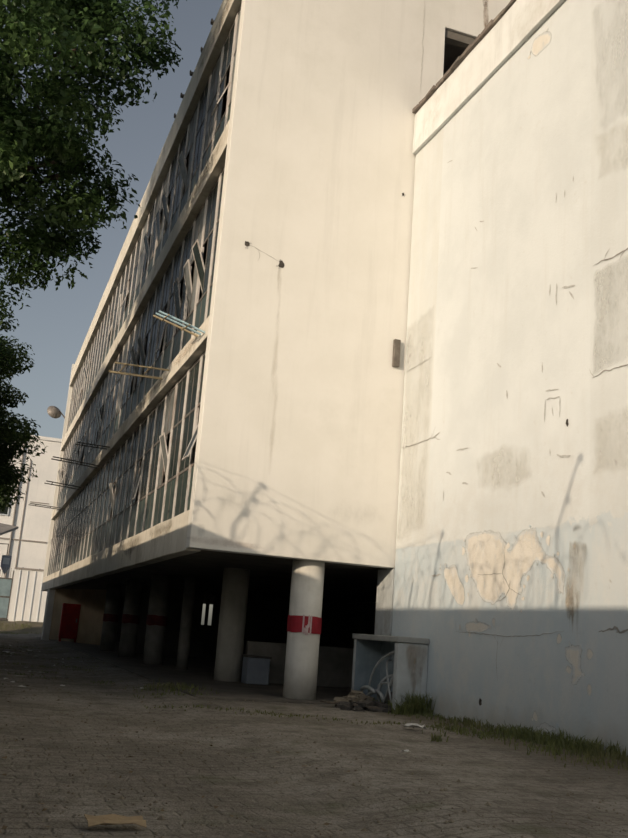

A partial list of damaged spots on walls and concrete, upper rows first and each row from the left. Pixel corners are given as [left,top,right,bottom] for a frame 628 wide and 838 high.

peeling [439,525,570,613]